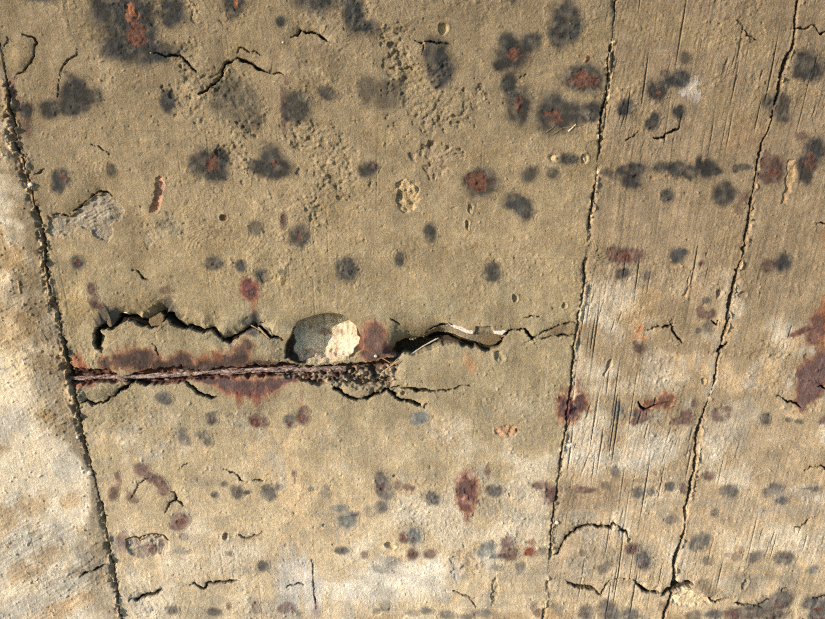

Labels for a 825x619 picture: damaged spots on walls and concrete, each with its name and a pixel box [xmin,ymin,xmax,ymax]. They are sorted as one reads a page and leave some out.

corrosion [82,0,191,75]
crack [149,47,284,95]
damp [674,75,707,105]
spalling [47,194,125,241]
spalling [69,365,220,387]
corrosion [68,253,311,448]
spalling [266,312,405,395]
corrosion [781,292,825,424]
damp [558,393,762,513]
crack [552,522,629,556]
damp [272,541,466,619]
crack [565,578,788,609]